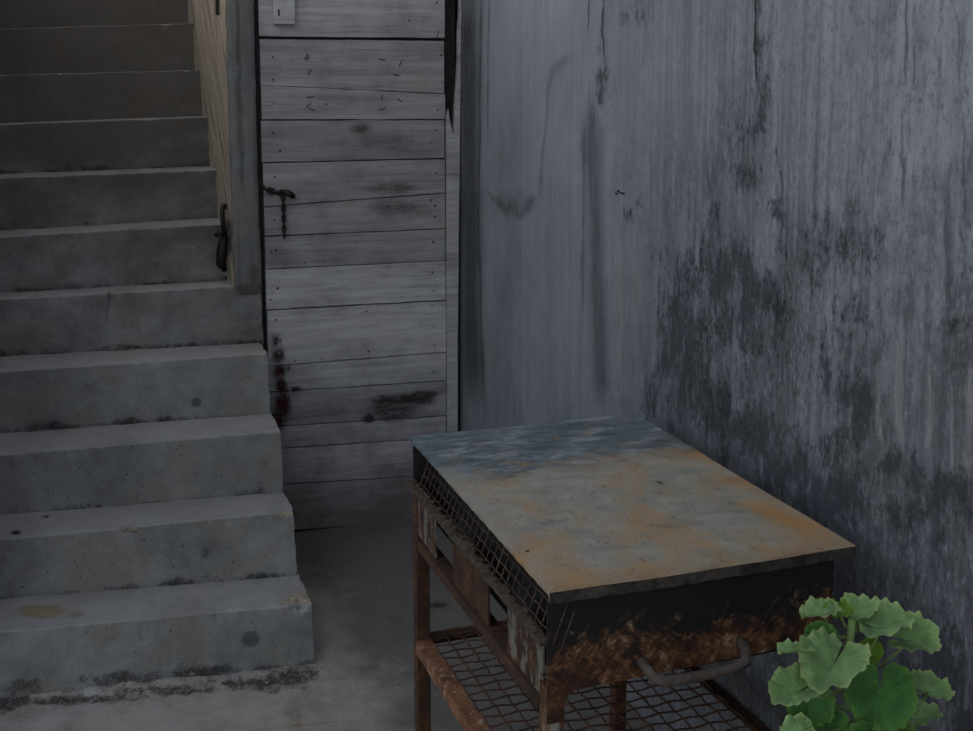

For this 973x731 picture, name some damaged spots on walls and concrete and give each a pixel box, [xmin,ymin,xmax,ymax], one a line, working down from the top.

damp [739,0,771,142]
damp [643,205,902,528]
damp [887,376,973,559]